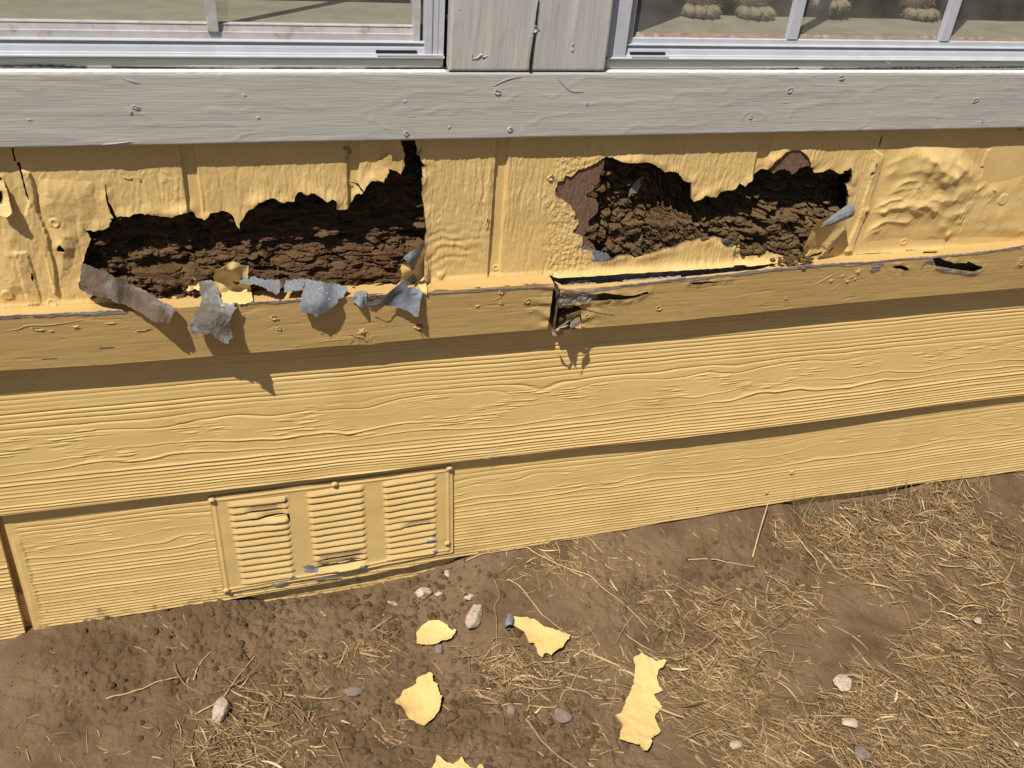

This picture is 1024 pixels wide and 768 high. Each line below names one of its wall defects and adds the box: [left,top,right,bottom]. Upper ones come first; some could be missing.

peeling [546,158,605,250]
peeling [768,150,810,174]
spalling [834,169,851,213]
peeling [427,245,1024,309]